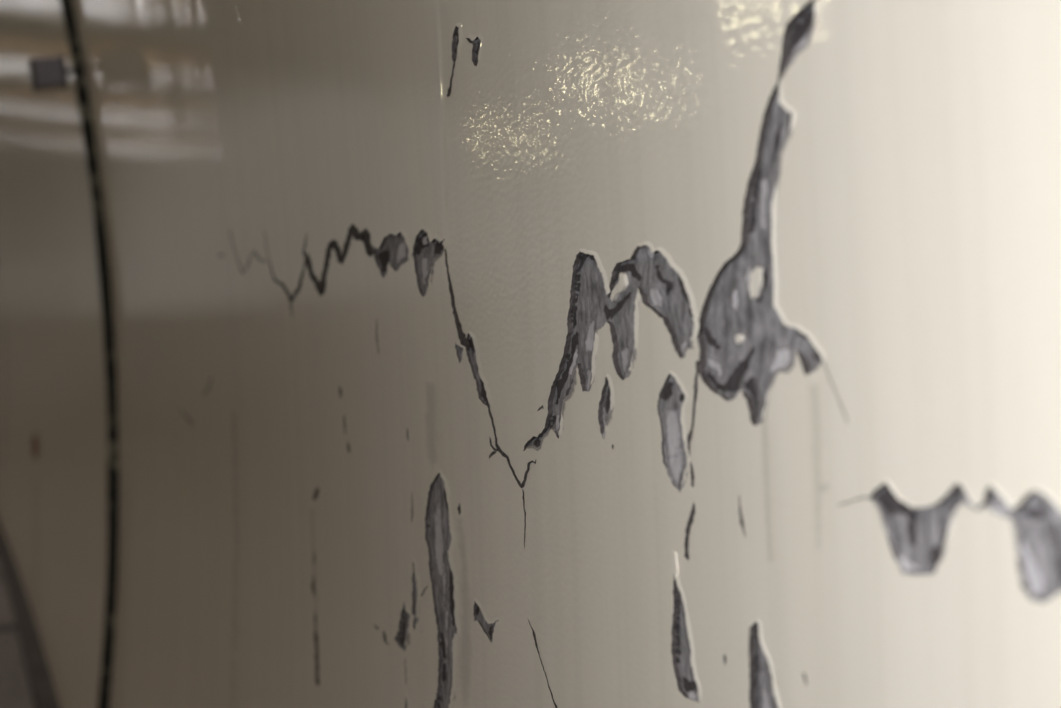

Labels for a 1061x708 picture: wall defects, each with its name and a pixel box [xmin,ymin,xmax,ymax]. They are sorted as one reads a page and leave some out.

spalling [447,23,484,97]
spalling [523,0,826,451]
crack [218,224,536,548]
spalling [657,370,690,493]
spalling [374,469,462,708]
crack [527,618,557,708]
spalling [671,551,702,703]
spalling [749,619,783,708]
spalling [869,479,1061,603]